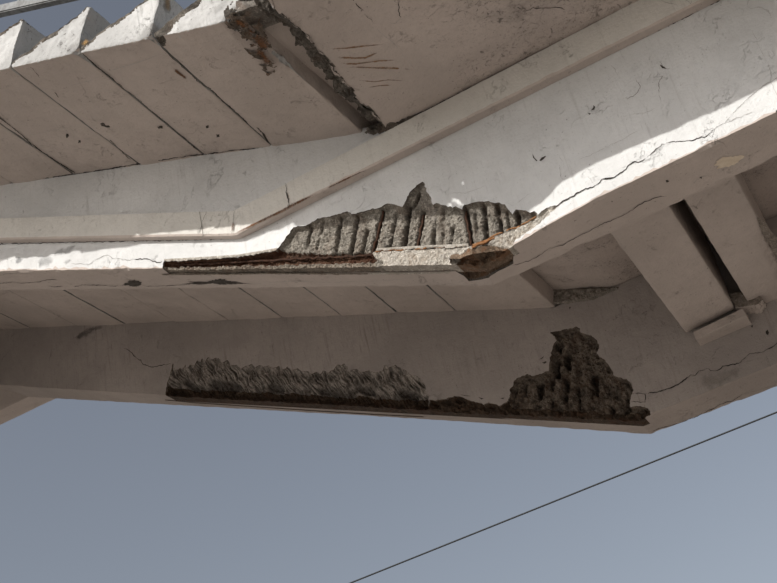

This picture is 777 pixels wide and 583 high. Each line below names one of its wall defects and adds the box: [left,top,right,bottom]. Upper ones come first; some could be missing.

spalling [225,0,416,135]
rust [337,45,399,69]
crack [556,35,776,207]
spalling [162,183,558,285]
spalling [166,327,651,426]
crack [633,343,777,403]